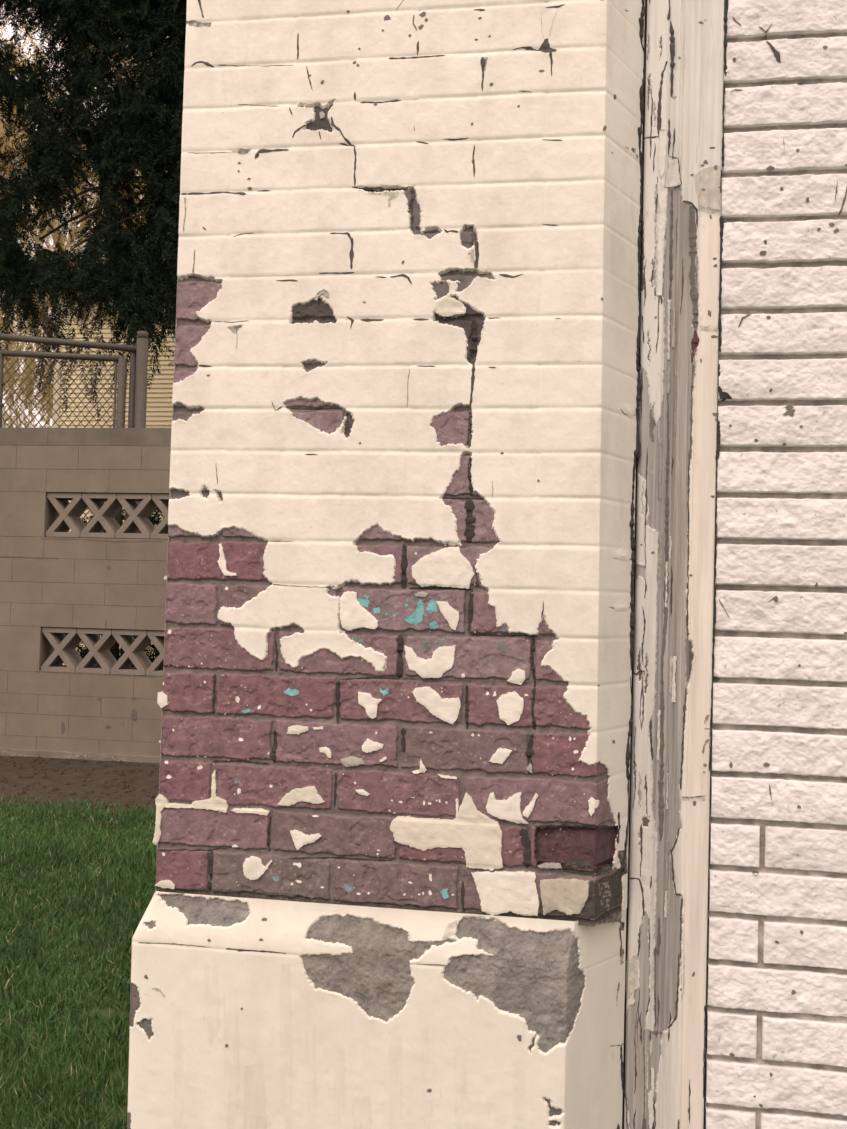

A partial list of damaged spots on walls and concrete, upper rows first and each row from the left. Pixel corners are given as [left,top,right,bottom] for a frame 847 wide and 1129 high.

peeling [654,130,718,390]
peeling [174,275,222,383]
peeling [291,298,337,324]
peeling [302,360,326,372]
peeling [285,397,361,444]
crack [347,317,384,329]
peeling [431,270,494,364]
crack [468,357,496,448]
peeling [640,535,672,607]
peeling [153,403,623,1053]
peeling [639,656,679,918]
peeling [646,1040,654,1129]